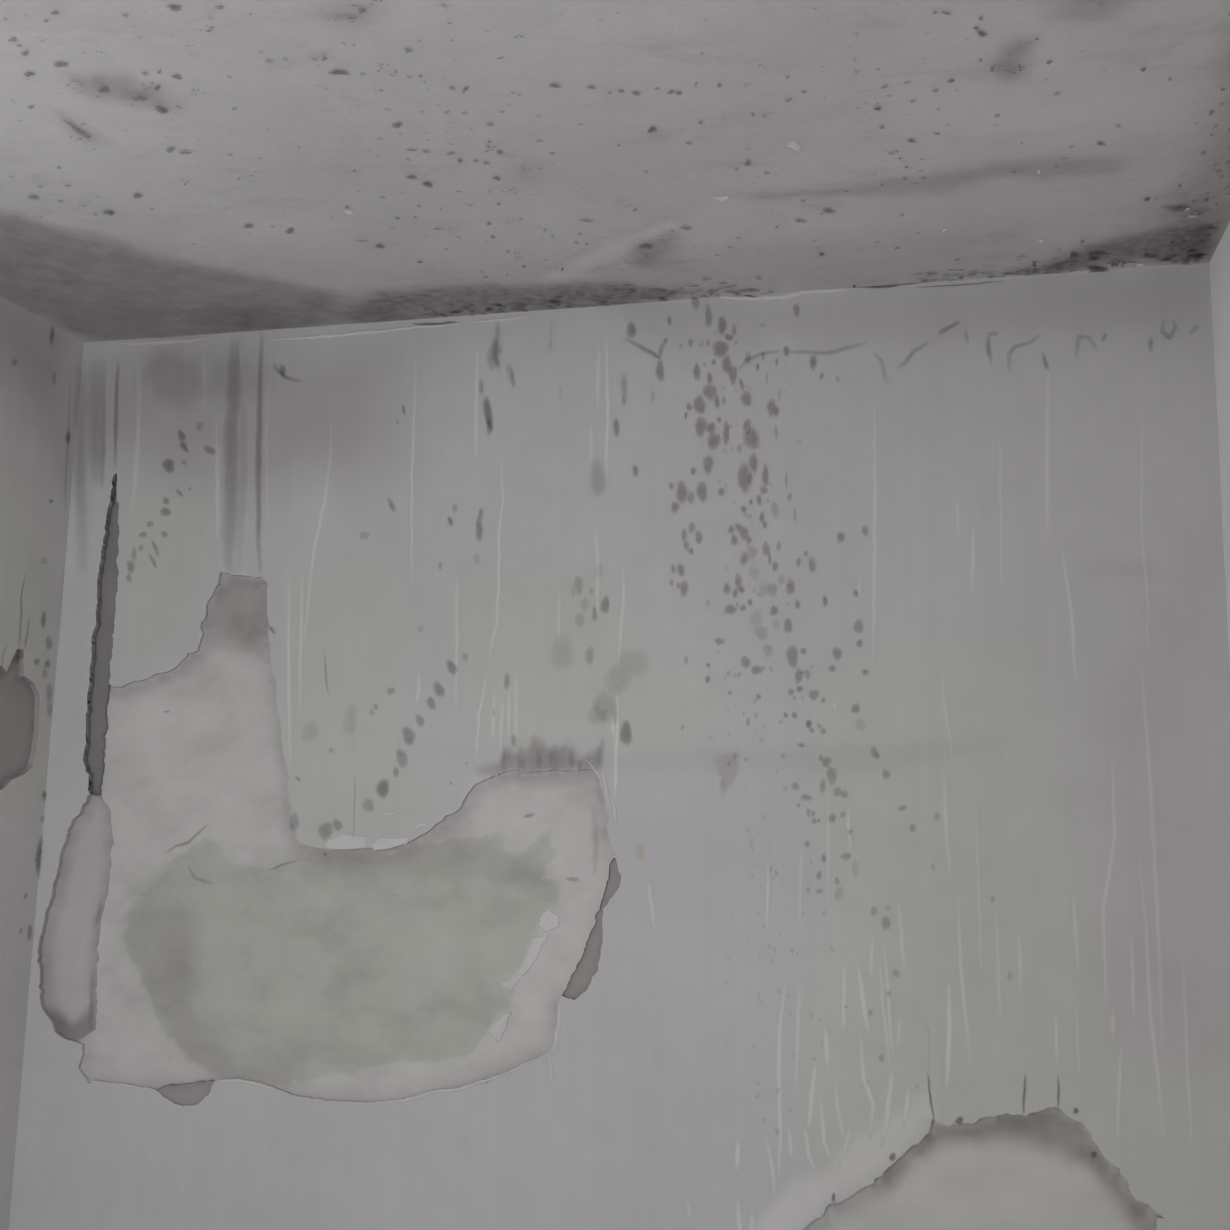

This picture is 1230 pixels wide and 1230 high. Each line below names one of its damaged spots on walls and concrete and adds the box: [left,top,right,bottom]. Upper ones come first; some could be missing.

flaking render [0,649,40,790]
crack [84,474,120,795]
flaking render [37,473,621,1106]
flaking render [803,1107,1165,1230]